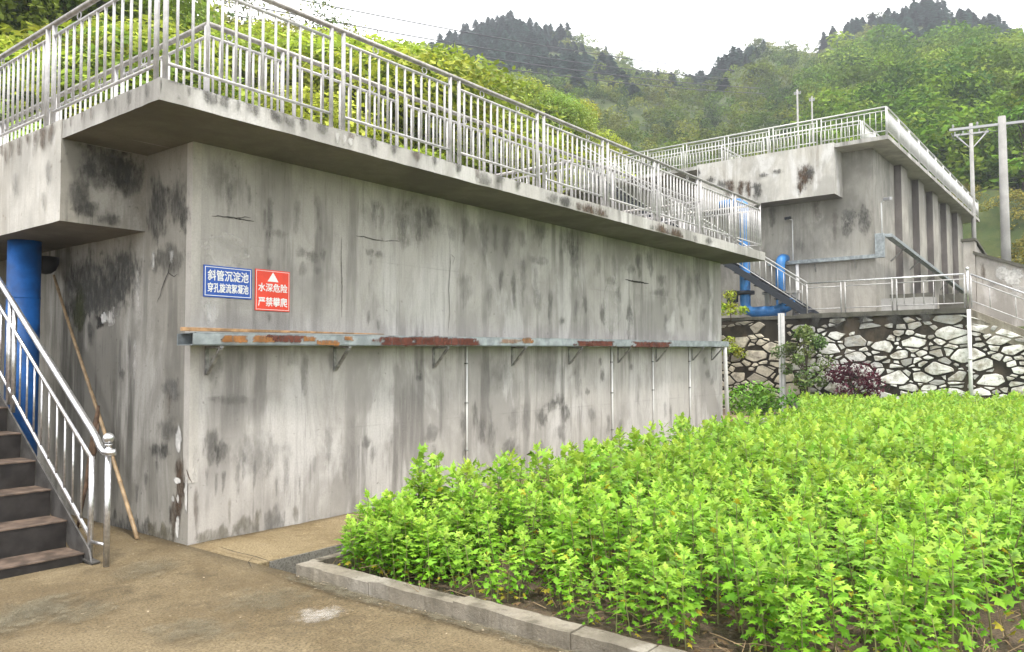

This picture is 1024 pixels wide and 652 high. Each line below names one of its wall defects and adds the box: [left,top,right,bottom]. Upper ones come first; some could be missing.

leakage [71,145,187,241]
crack [341,236,400,283]
leakage [65,252,139,341]
corrosion [222,335,353,346]
corrosion [372,336,480,346]